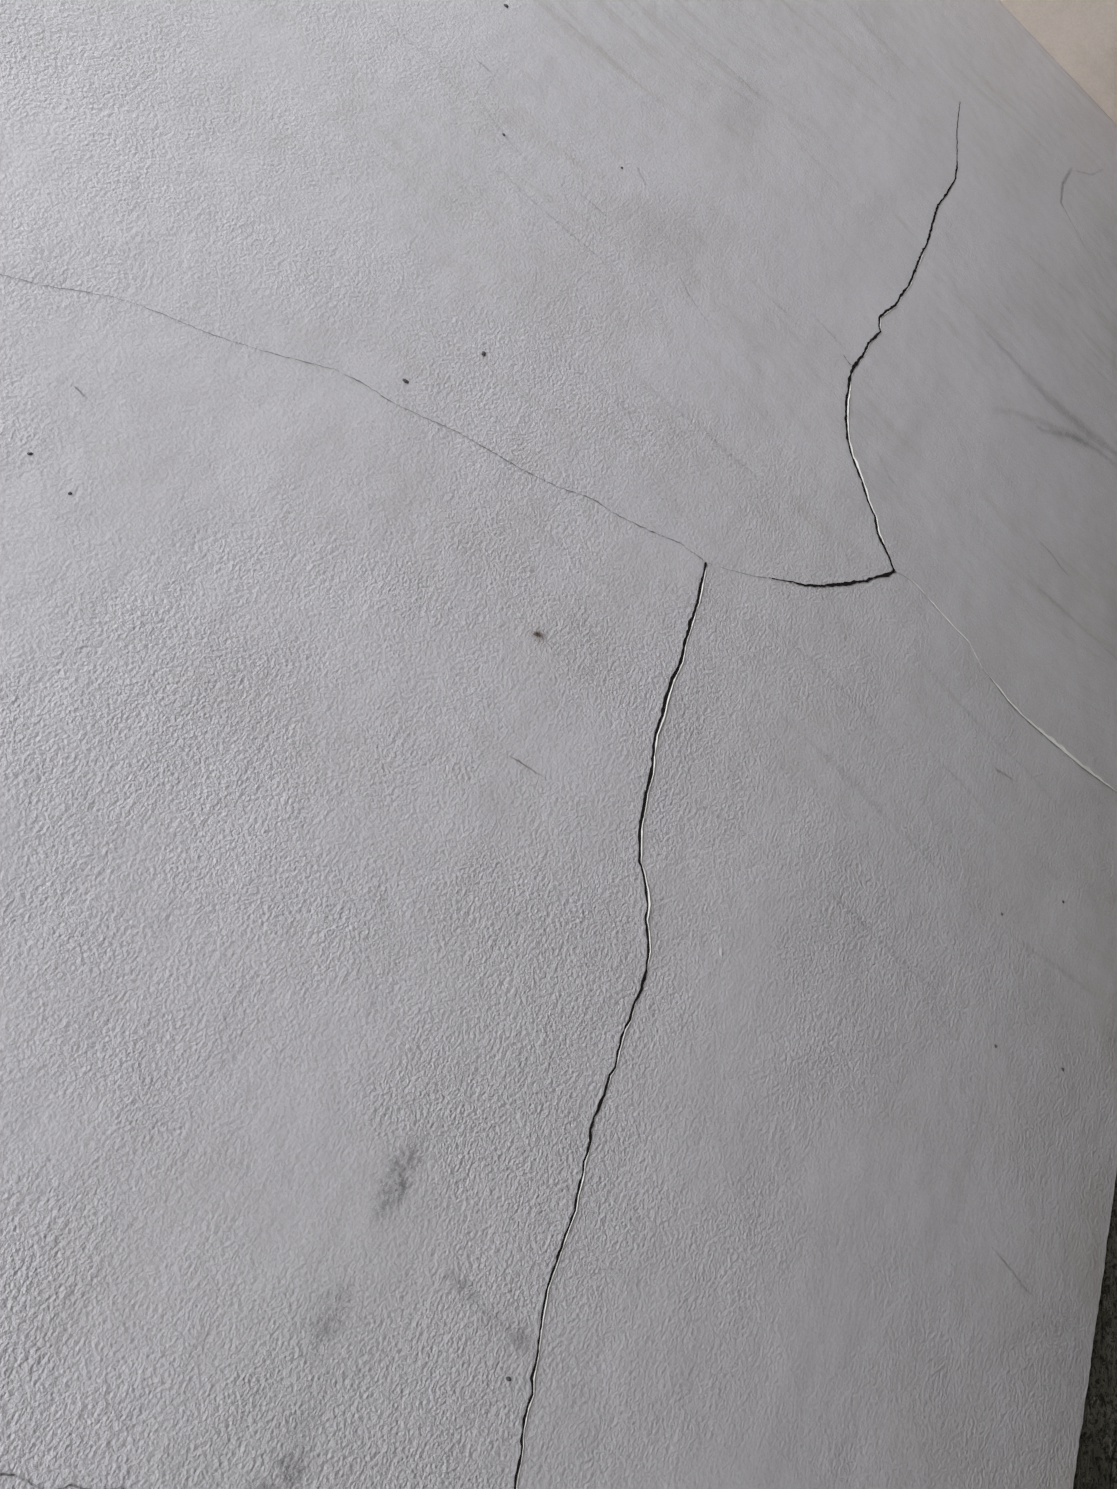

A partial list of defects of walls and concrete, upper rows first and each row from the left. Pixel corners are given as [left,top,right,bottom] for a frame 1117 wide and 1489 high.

crack [772,104,1117,792]
crack [426,418,707,1489]
crack [0,1473,124,1489]